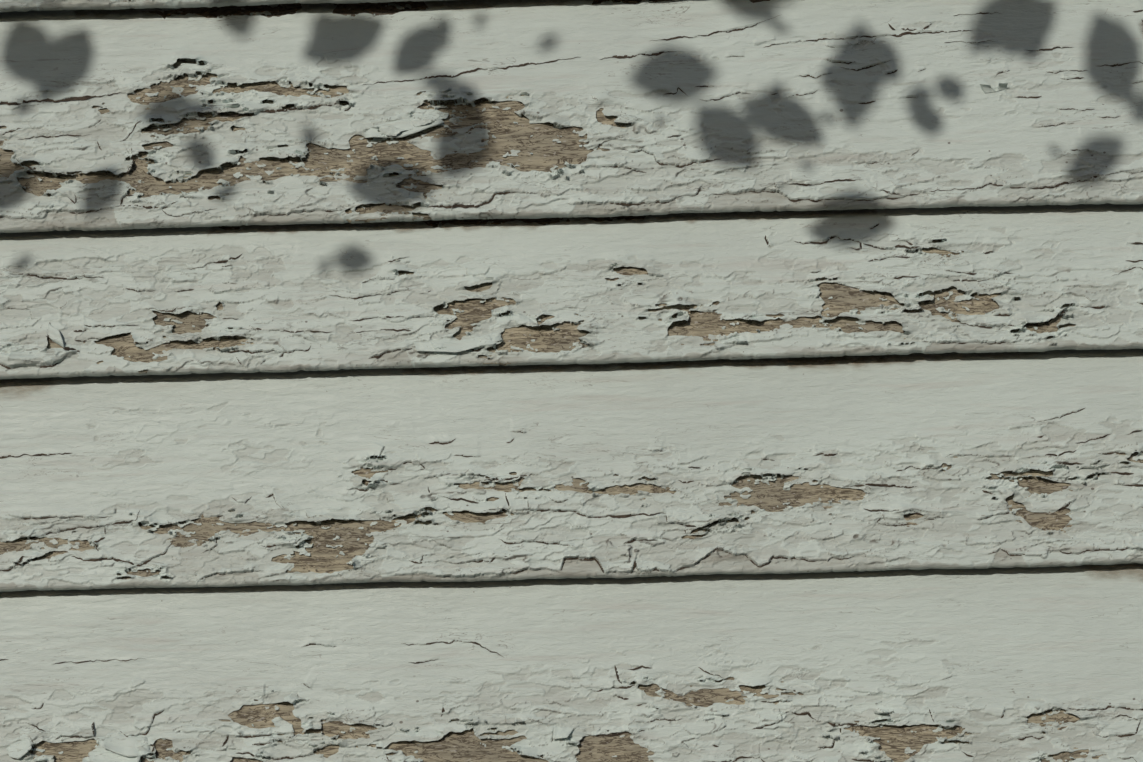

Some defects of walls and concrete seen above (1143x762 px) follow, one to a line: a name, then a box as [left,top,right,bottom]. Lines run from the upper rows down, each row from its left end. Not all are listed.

peeling [0,53,681,228]
crack [217,12,1143,196]
peeling [38,301,311,374]
peeling [371,276,602,366]
peeling [636,276,1105,351]
crack [347,439,737,533]
peeling [680,467,876,542]
crack [842,454,981,526]
crack [1038,408,1143,512]
peeling [216,695,662,762]
crack [586,666,680,737]
crack [753,701,891,762]